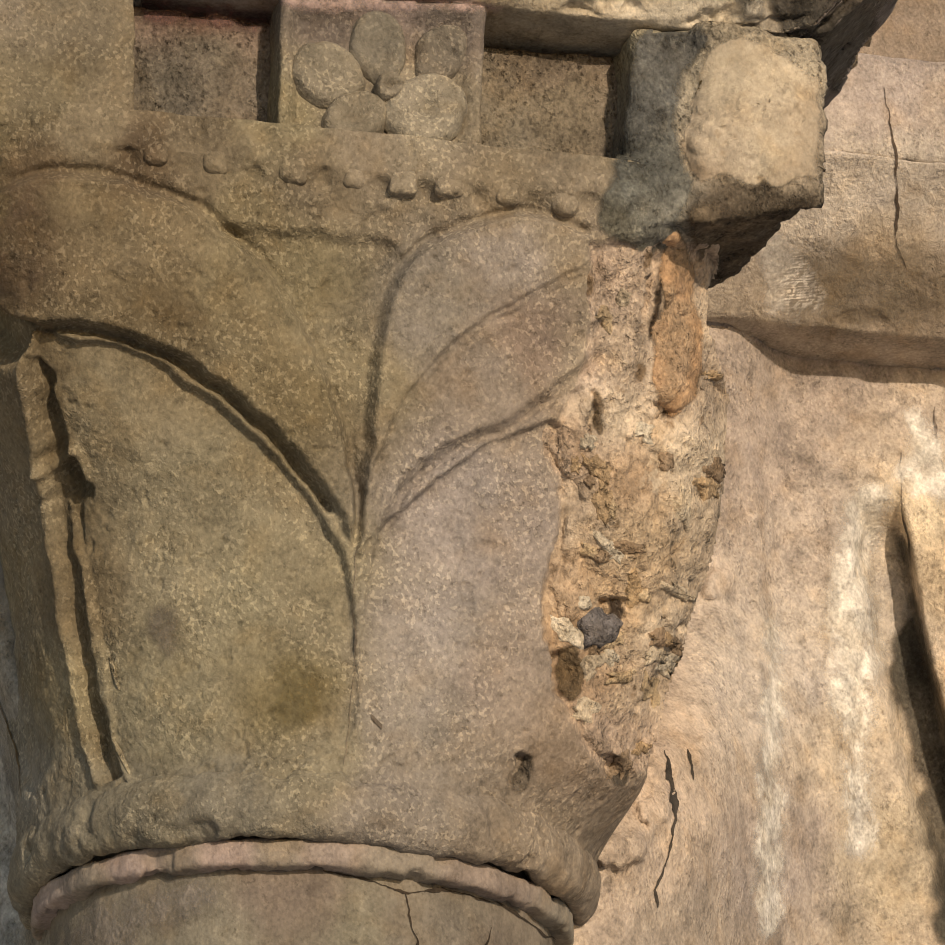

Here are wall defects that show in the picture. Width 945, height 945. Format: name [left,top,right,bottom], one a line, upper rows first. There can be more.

leakage [599,27,708,252]
crack [884,88,907,269]
leakage [759,236,945,324]
spalling [542,231,730,786]
spalling [513,756,532,793]
crack [654,749,694,907]
crack [323,870,556,945]